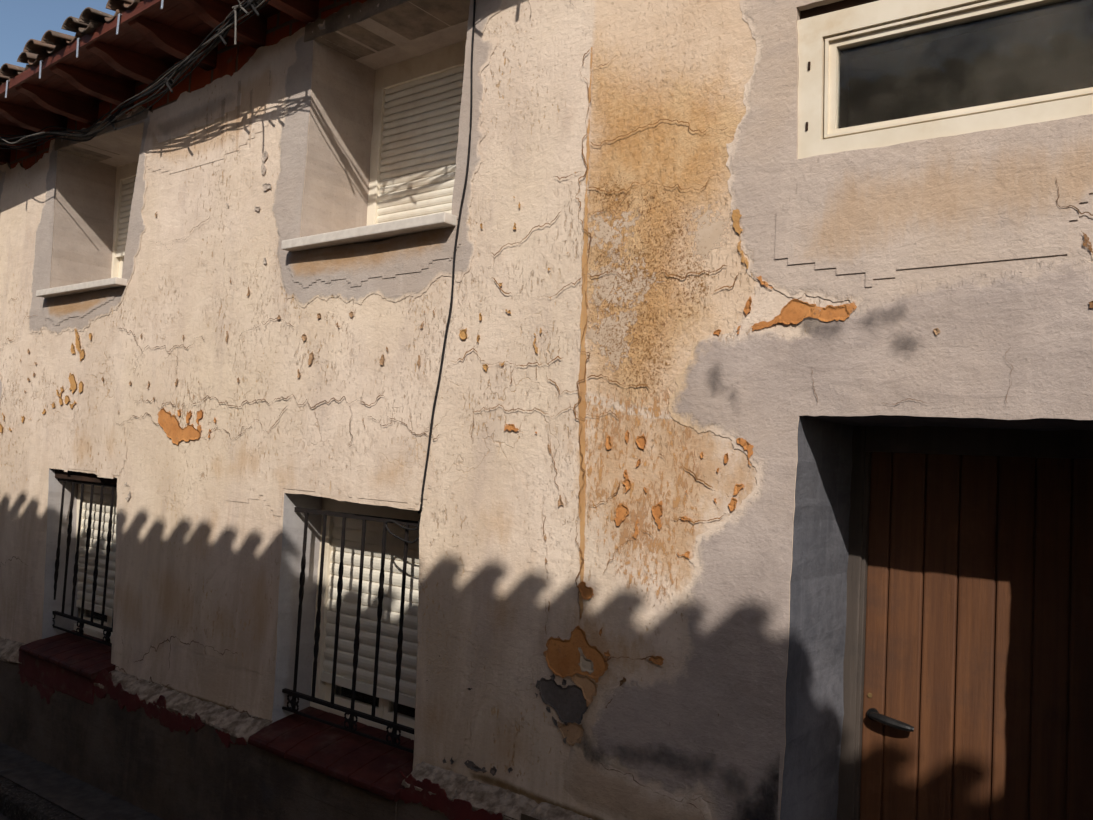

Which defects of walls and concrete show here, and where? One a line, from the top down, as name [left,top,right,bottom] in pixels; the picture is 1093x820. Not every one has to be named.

crack [1055,177,1093,216]
peeling [0,373,83,434]
peeling [70,328,92,361]
crack [119,328,204,375]
peeling [147,381,216,445]
crack [116,395,439,447]
crack [453,46,739,622]
peeling [535,0,857,746]
peeling [94,669,247,748]
leakage [726,769,779,820]